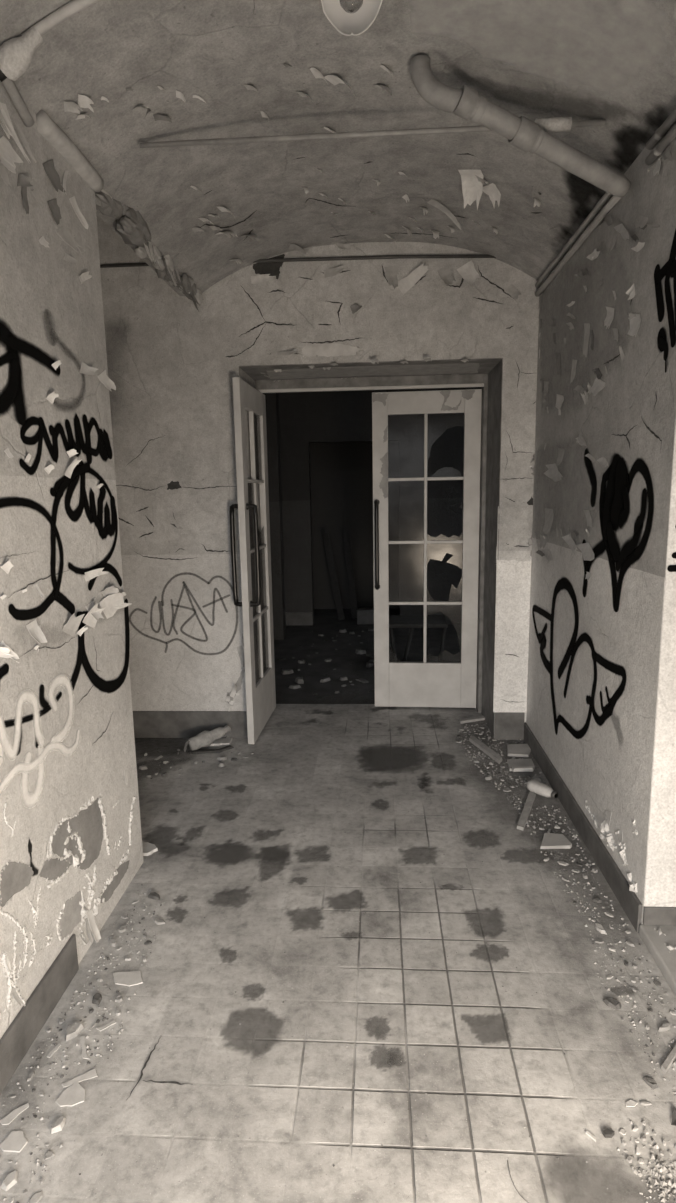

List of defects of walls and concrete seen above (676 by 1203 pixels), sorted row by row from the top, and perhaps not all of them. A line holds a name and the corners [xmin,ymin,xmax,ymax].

peeling [64,94,108,120]
spalling [0,102,203,311]
crack [226,270,359,358]
peeling [384,261,480,295]
crack [382,266,514,329]
peeling [539,215,660,415]
crack [504,434,532,503]
damp [205,830,328,884]
spalling [0,770,136,1018]
damp [287,908,322,929]
damp [223,984,281,1053]
damp [366,1019,403,1067]